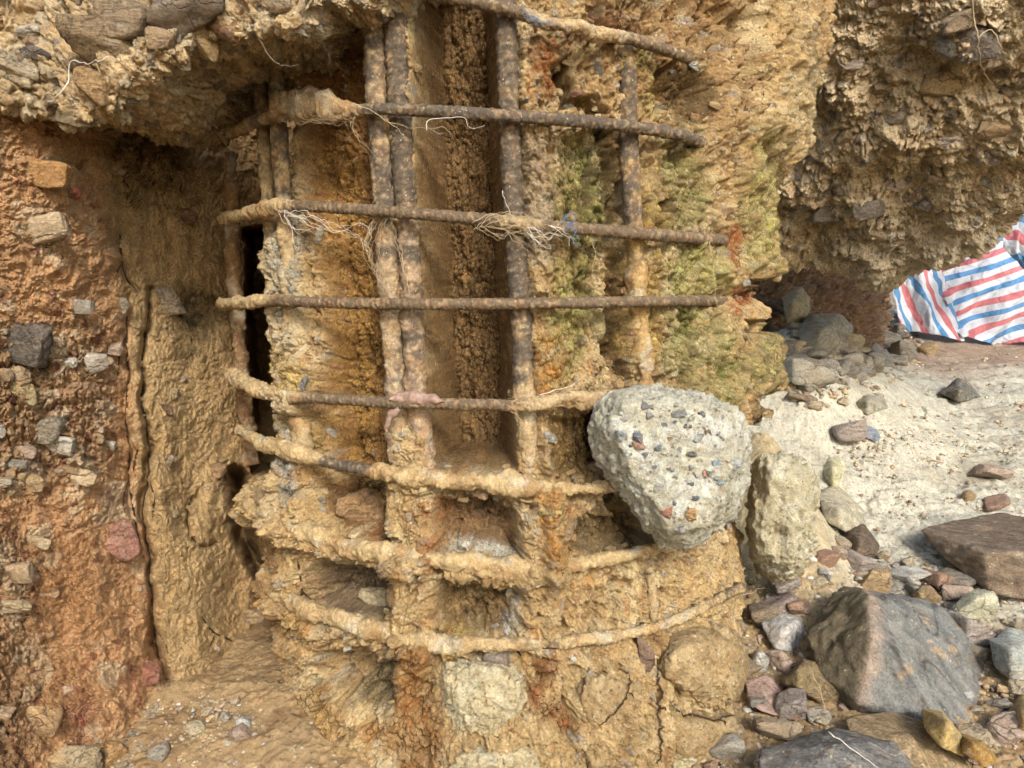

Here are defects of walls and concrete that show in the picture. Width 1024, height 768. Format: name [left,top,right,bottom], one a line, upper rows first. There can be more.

corrosion [529,32,584,102]
spalling [552,59,601,117]
corrosion [589,15,641,33]
spalling [662,61,721,124]
corrosion [269,353,307,391]
corrosion [301,131,384,462]
spalling [413,0,516,469]
spalling [602,239,630,383]
corrosion [642,163,667,352]
damp [671,253,740,404]
spalling [544,411,595,476]
crack [600,667,734,768]